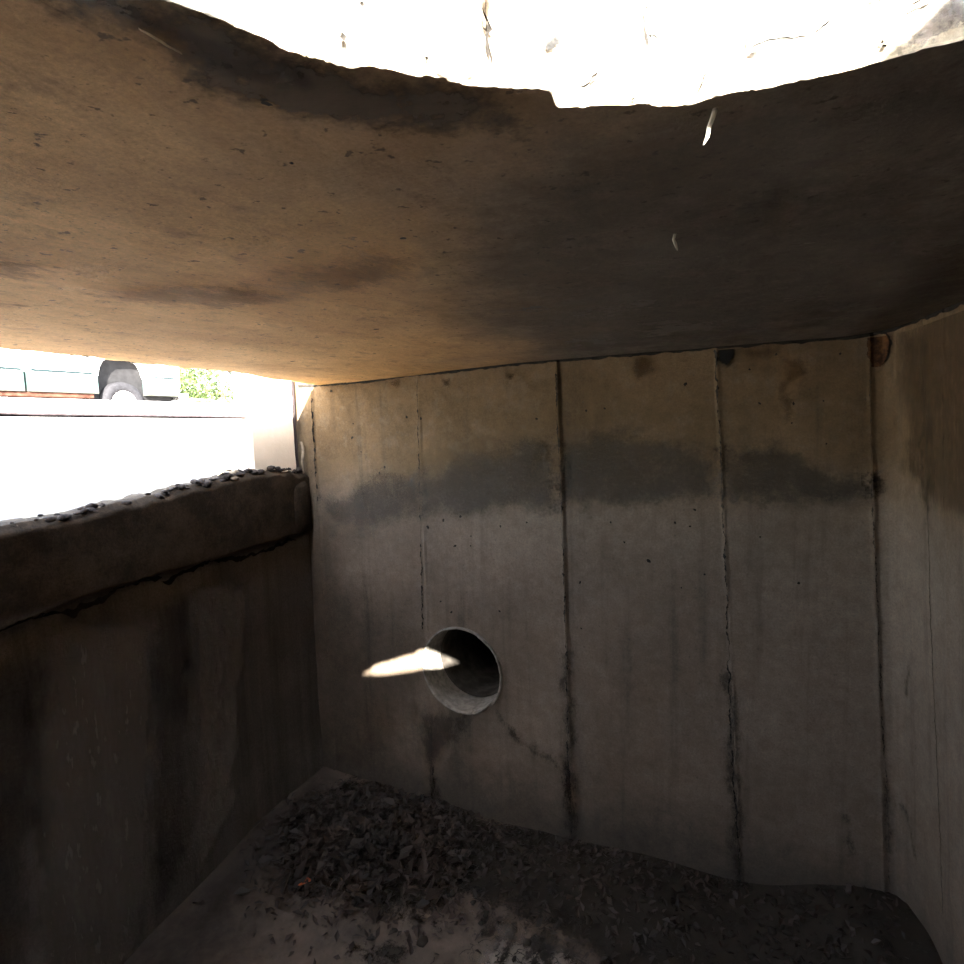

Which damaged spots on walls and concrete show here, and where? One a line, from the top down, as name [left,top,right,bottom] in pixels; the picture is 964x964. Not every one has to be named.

crack [482,3,493,66]
crack [749,14,831,50]
water stain [327,436,710,525]
water stain [722,448,881,502]